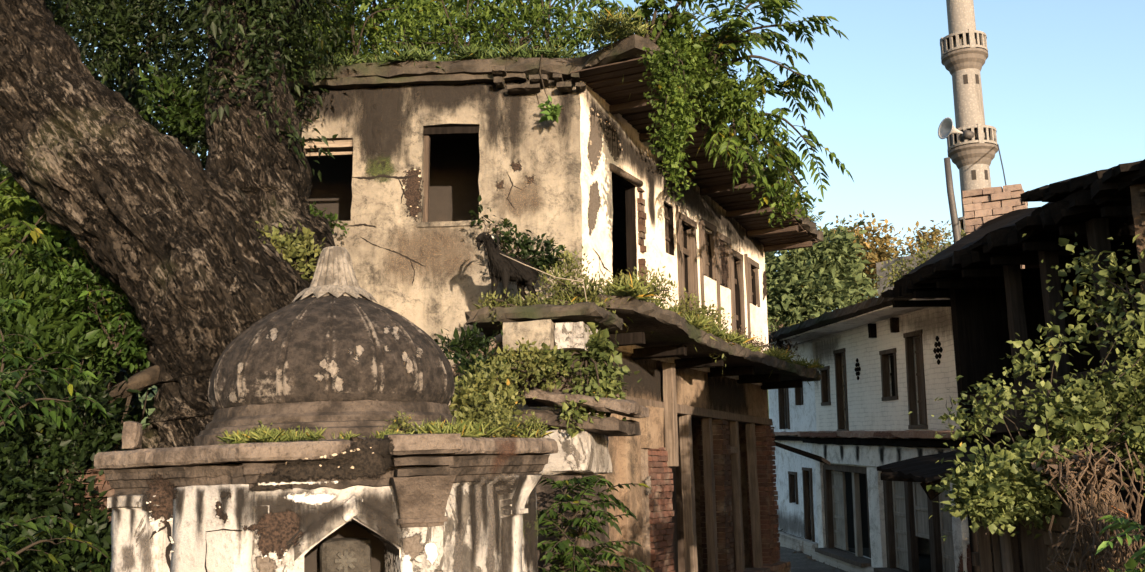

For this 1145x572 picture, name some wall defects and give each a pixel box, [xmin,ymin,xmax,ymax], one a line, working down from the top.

water stain [290,79,529,166]
spalling [402,167,425,222]
peeling [587,107,623,236]
peeling [314,359,344,392]
peeling [383,325,423,375]
water stain [111,493,154,572]
crack [149,509,174,572]
water stain [176,489,204,529]
crack [205,526,273,572]
spalling [242,447,374,572]
peeling [384,533,442,572]
water stain [454,472,543,572]